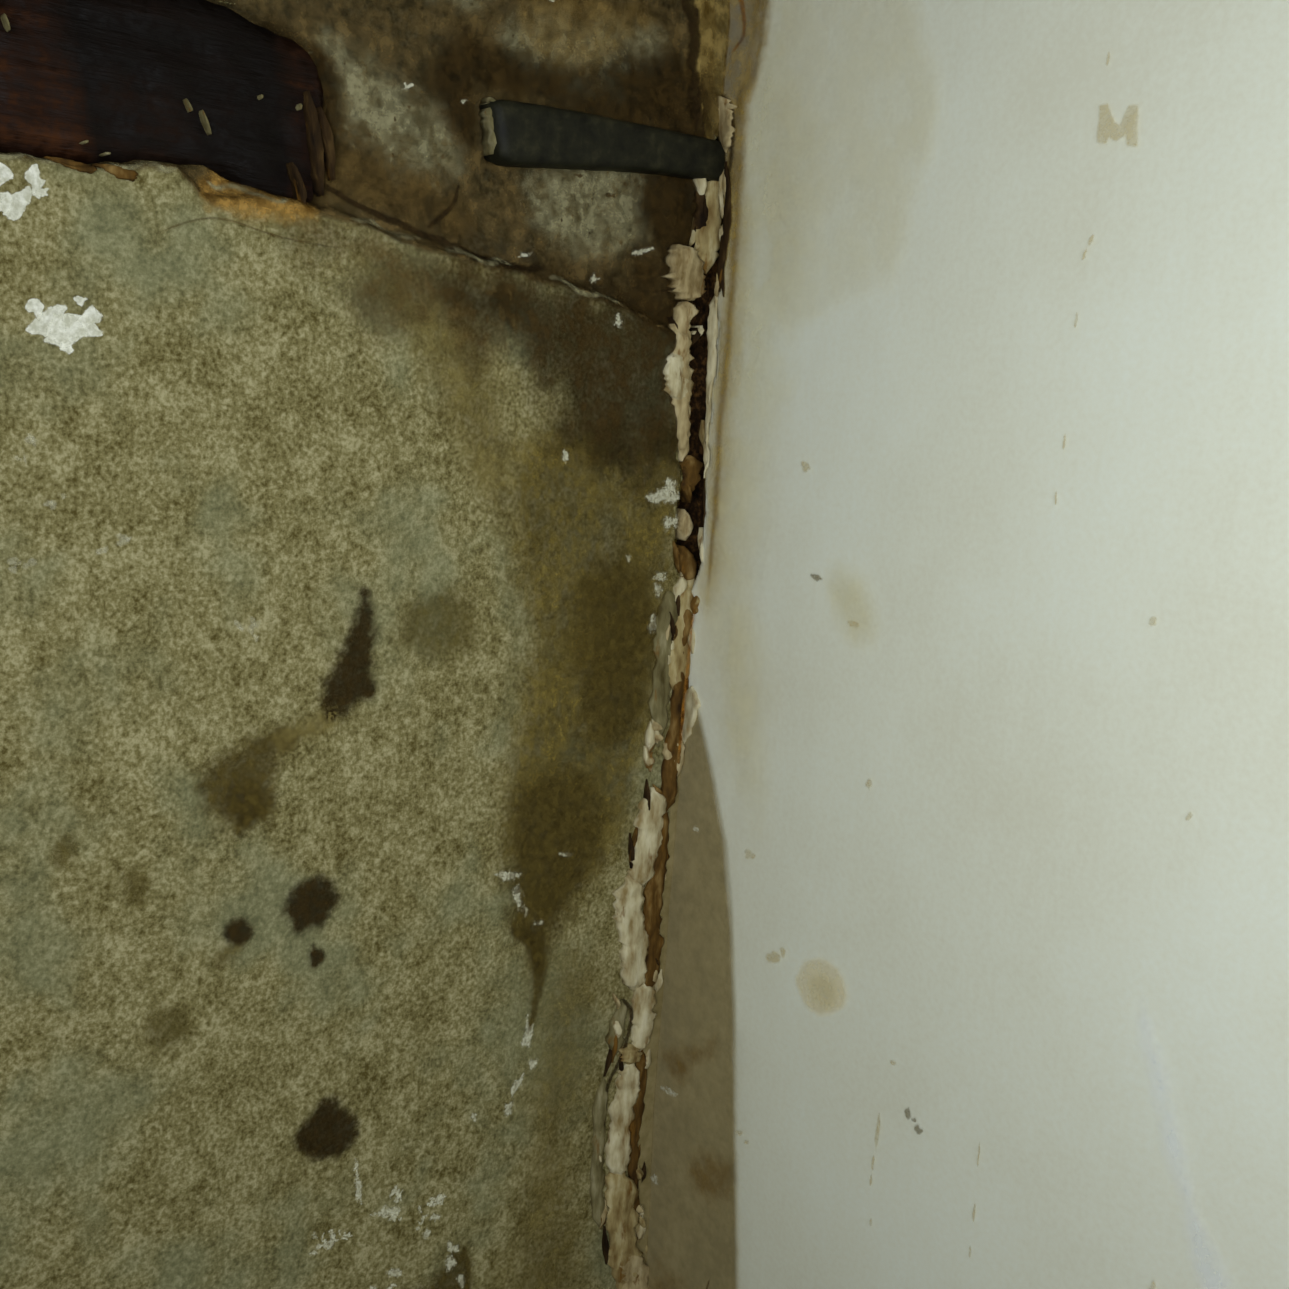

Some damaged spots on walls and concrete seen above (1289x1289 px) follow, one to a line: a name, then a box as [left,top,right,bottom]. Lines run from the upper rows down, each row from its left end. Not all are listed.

damp [364,174,697,1029]
flaking render [89,0,738,1289]
damp [198,588,375,833]
damp [285,876,339,933]
damp [224,919,253,952]
damp [310,944,325,968]
damp [296,1098,359,1161]
damp [312,1230,350,1254]
damp [370,1187,402,1221]
damp [417,1194,445,1237]